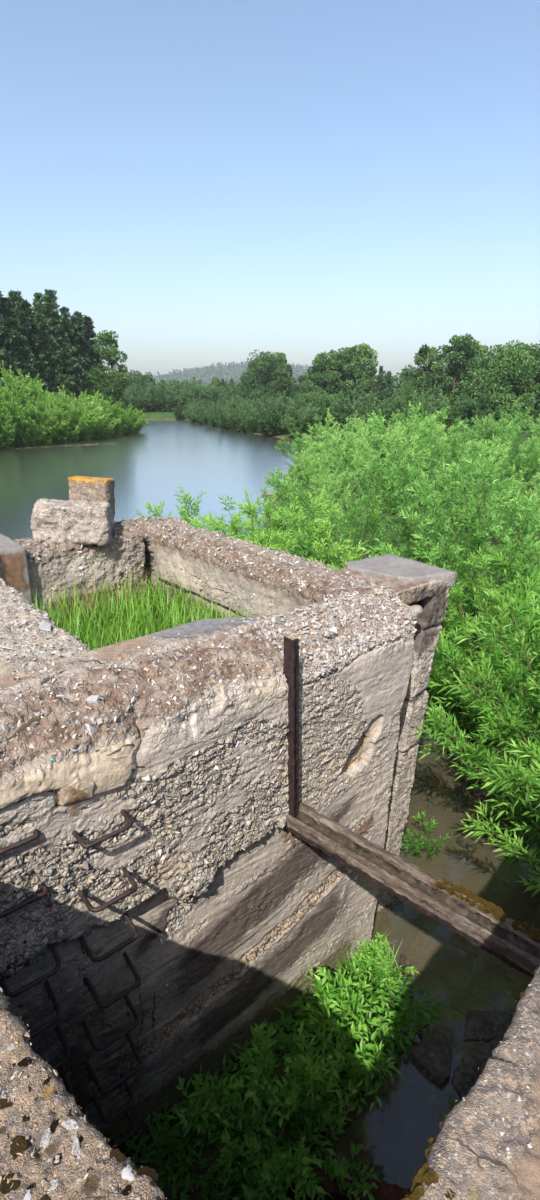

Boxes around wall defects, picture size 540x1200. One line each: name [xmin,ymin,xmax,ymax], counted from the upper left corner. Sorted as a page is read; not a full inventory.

spalling [0,620,417,958]
water stain [332,802,351,822]
water stain [137,906,173,955]
water stain [174,842,328,992]
water stain [180,891,339,1043]